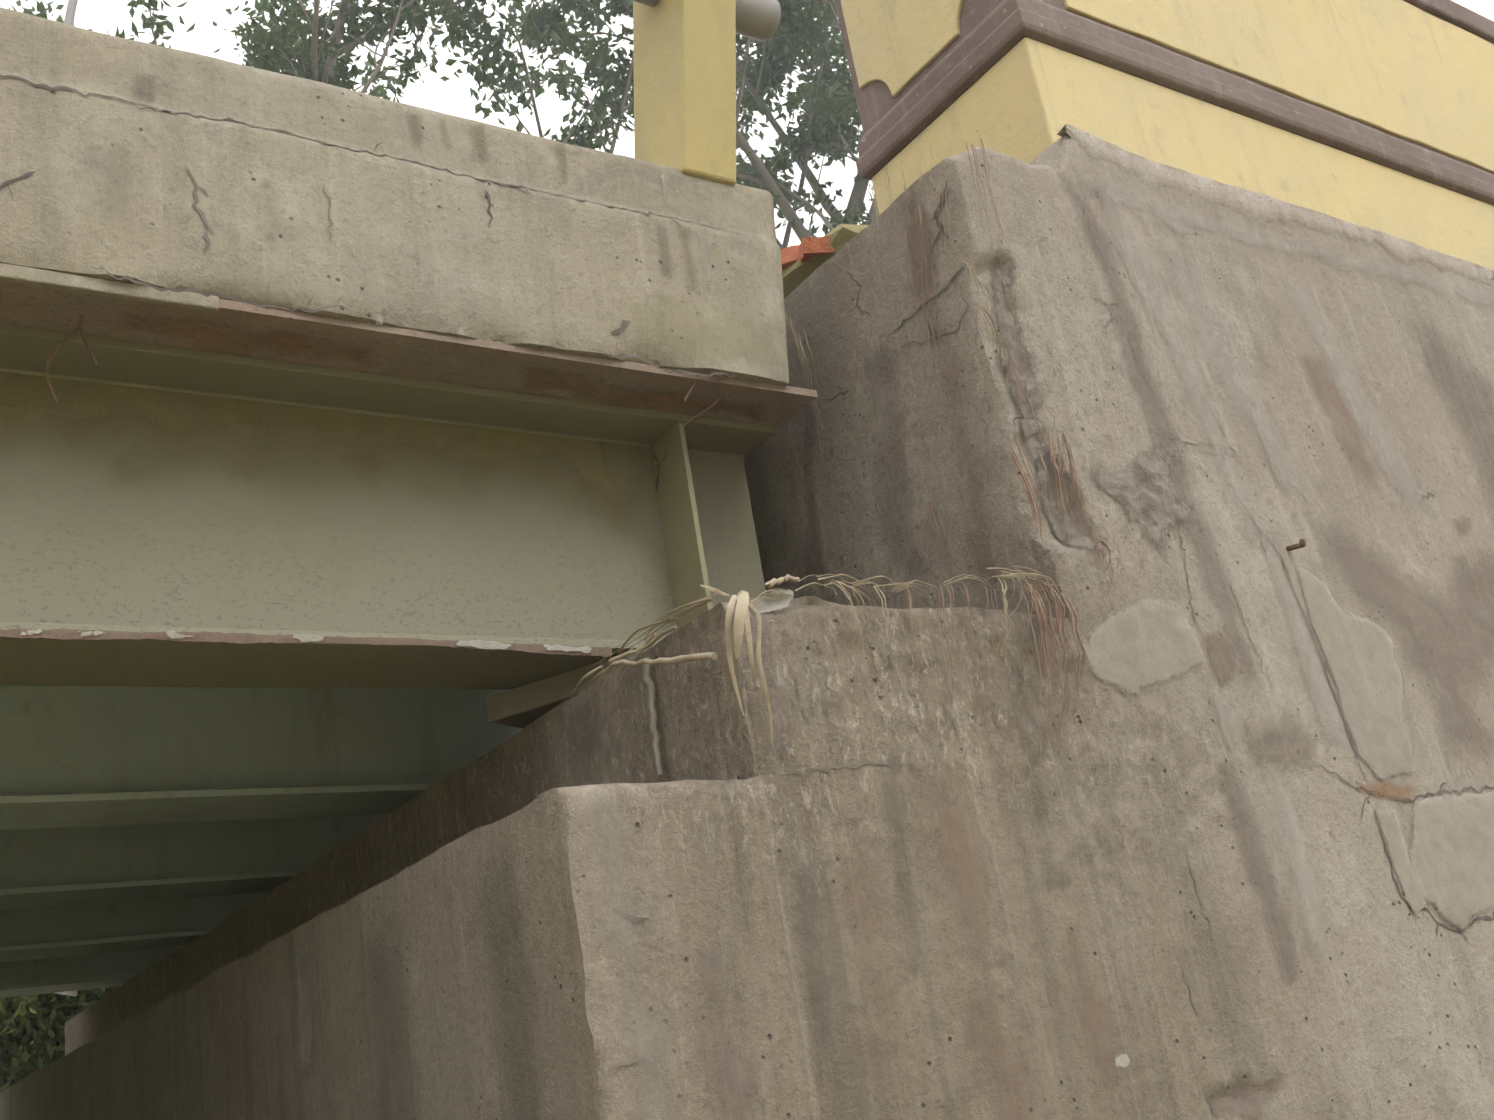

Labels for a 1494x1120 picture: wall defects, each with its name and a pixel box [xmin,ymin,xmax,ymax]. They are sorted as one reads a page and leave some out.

crack [91,166,362,314]
crack [0,74,773,242]
crack [847,181,968,347]
crack [1312,761,1494,943]